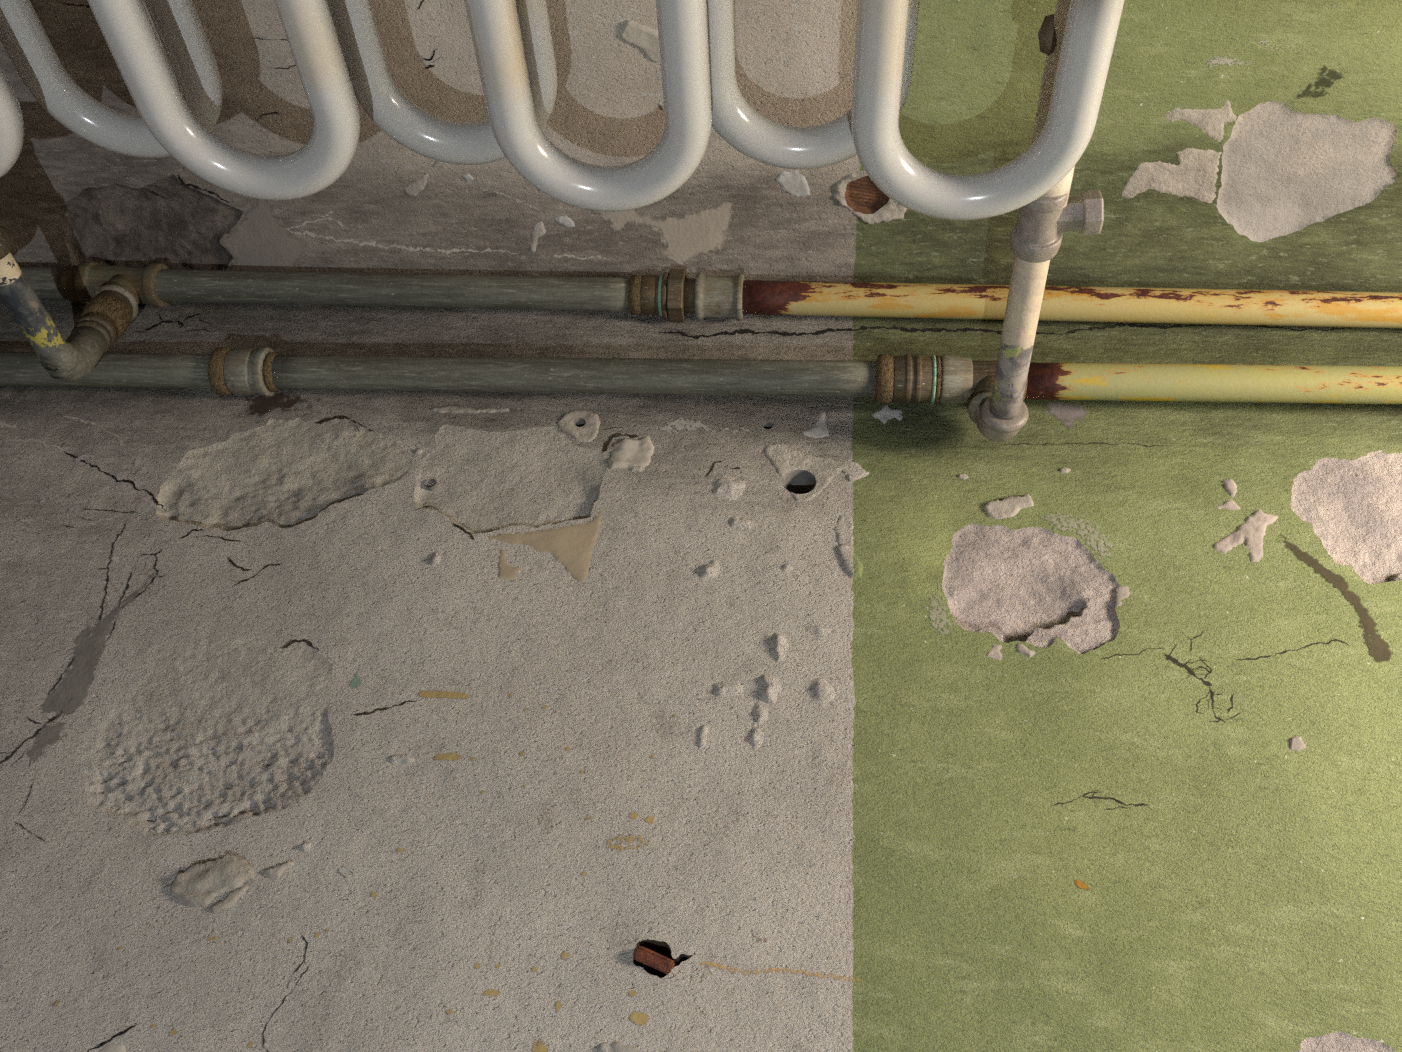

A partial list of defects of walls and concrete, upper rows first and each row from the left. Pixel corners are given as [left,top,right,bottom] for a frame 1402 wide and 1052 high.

spalling [1122,100,1397,242]
crack [64,451,283,641]
spalling [925,494,1130,661]
spalling [1213,450,1402,585]
crack [0,657,75,841]
crack [262,935,309,1052]
hole [633,939,695,978]
spalling [1295,1031,1396,1052]